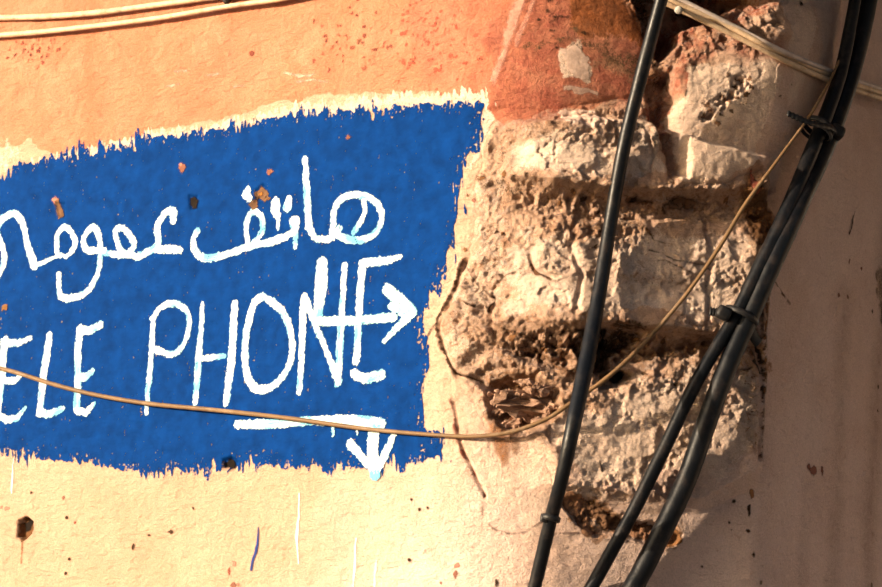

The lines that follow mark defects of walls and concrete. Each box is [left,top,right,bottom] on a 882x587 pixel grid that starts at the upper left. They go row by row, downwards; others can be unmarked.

peeling [362,2,482,72]
crack [427,261,552,382]
flaking render [440,0,628,485]
flaking render [562,0,790,537]
crack [449,400,541,534]
flaking render [630,522,653,540]
flaking render [666,520,684,547]